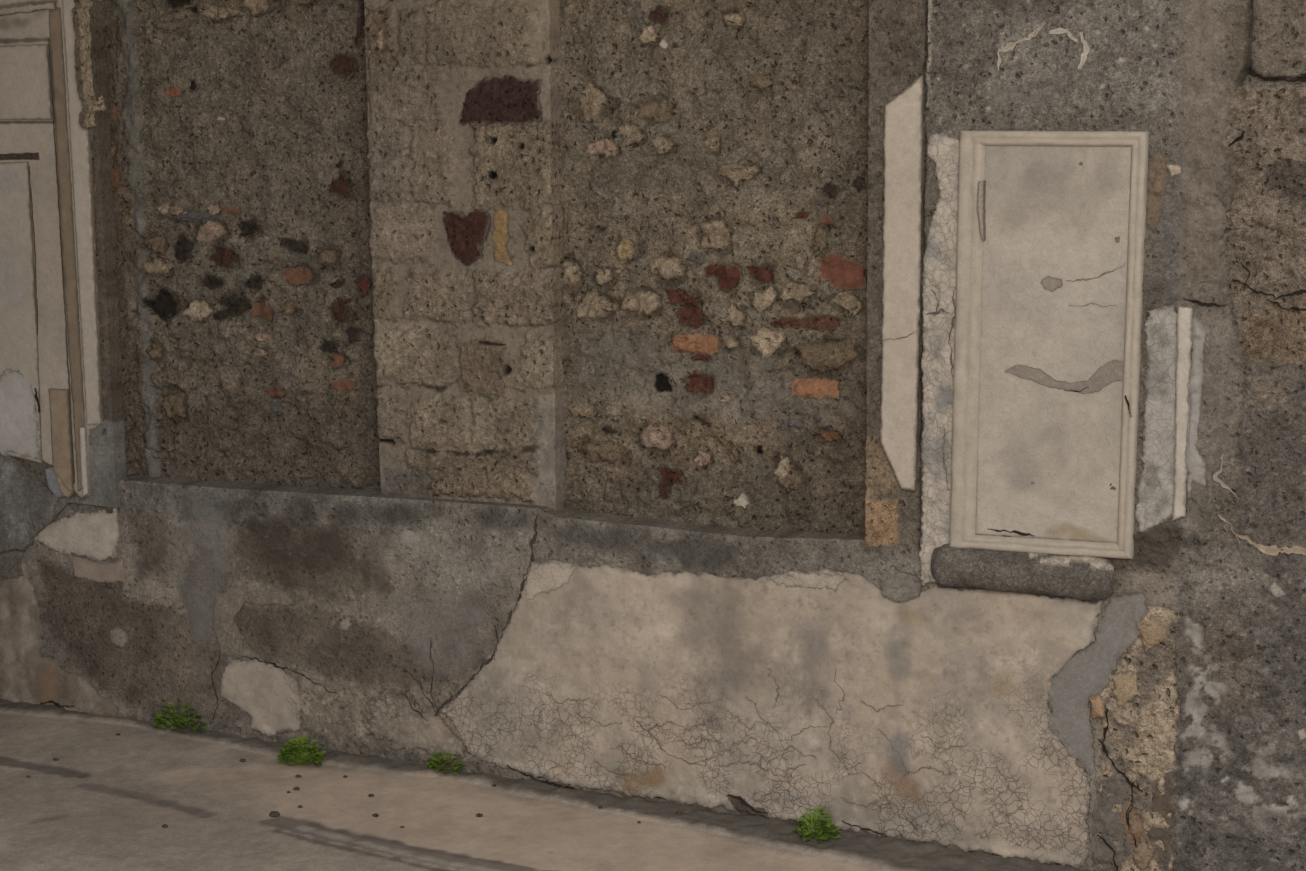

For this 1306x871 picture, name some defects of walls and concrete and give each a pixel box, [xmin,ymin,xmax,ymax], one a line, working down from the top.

crack [1248,72,1306,82]
crack [1183,262,1306,311]
peeling [0,557,119,717]
crack [211,656,339,722]
crack [404,514,538,721]
crack [507,765,575,789]
crack [545,668,967,837]
peeling [360,559,1181,871]